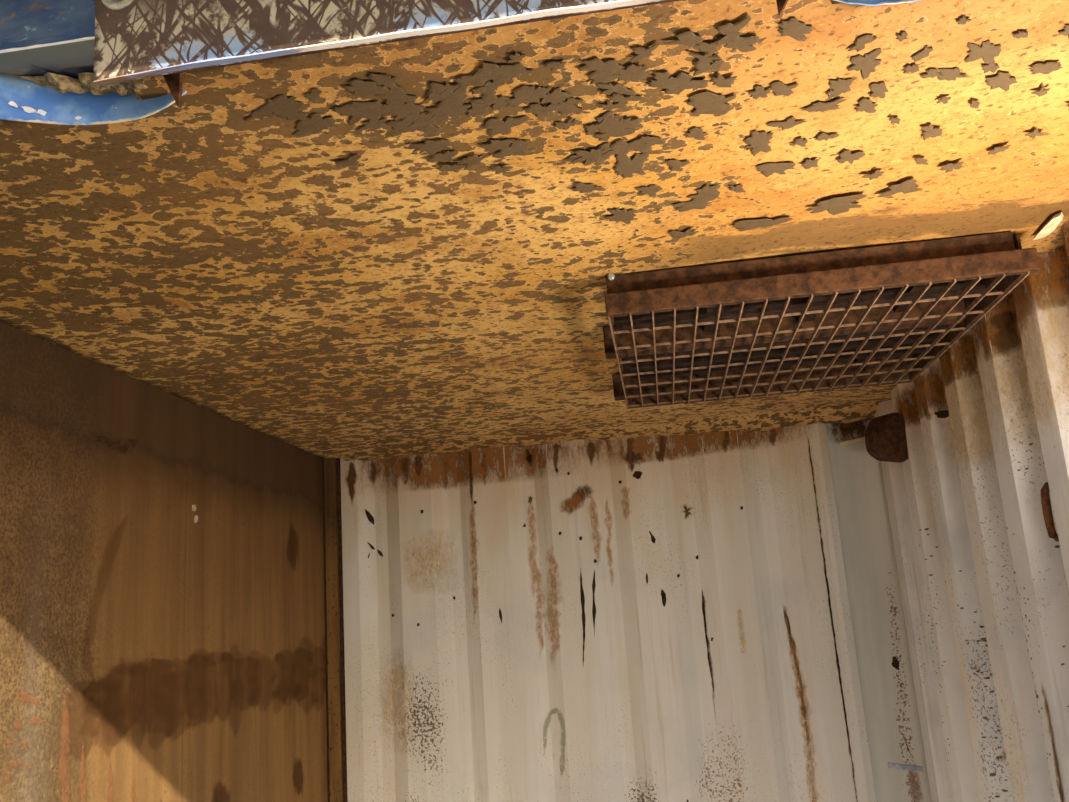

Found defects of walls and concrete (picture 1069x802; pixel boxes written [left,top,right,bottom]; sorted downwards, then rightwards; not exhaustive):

peeling [777,18,814,41]
peeling [903,40,1017,91]
peeling [244,16,799,197]
peeling [744,35,889,177]
peeling [606,209,637,225]
peeling [673,185,746,212]
peeling [1033,212,1064,240]
rust [899,229,1069,424]
rust [347,442,568,502]
rust [588,426,793,479]
rust [832,421,866,441]
rust [784,607,809,744]